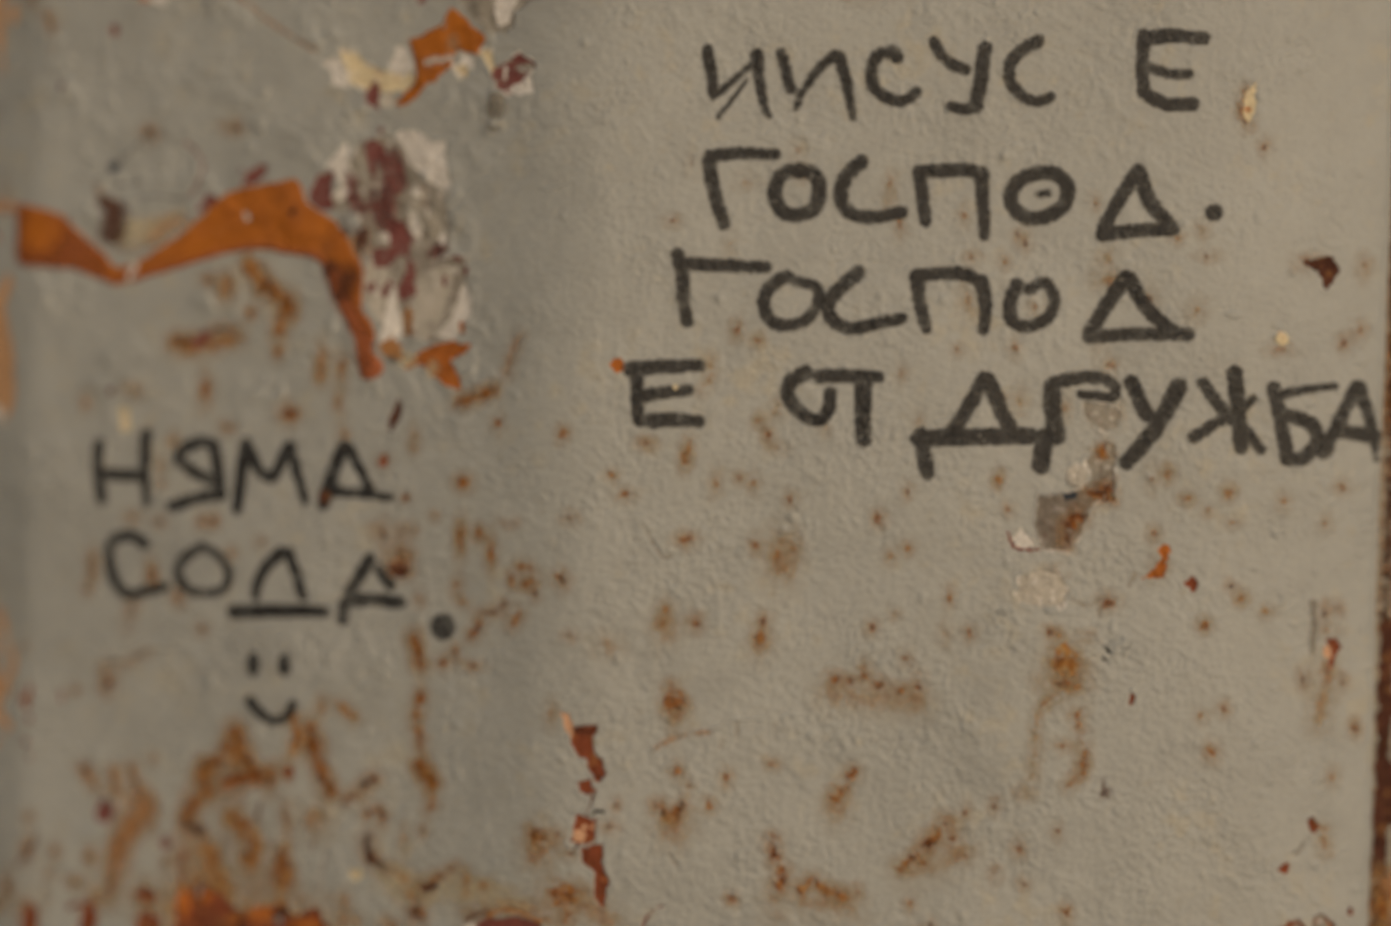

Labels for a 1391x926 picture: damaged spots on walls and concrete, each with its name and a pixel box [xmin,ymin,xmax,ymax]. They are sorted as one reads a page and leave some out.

peeling [239,164,268,187]
peeling [309,0,536,390]
peeling [995,399,1120,619]
rust [67,689,489,926]